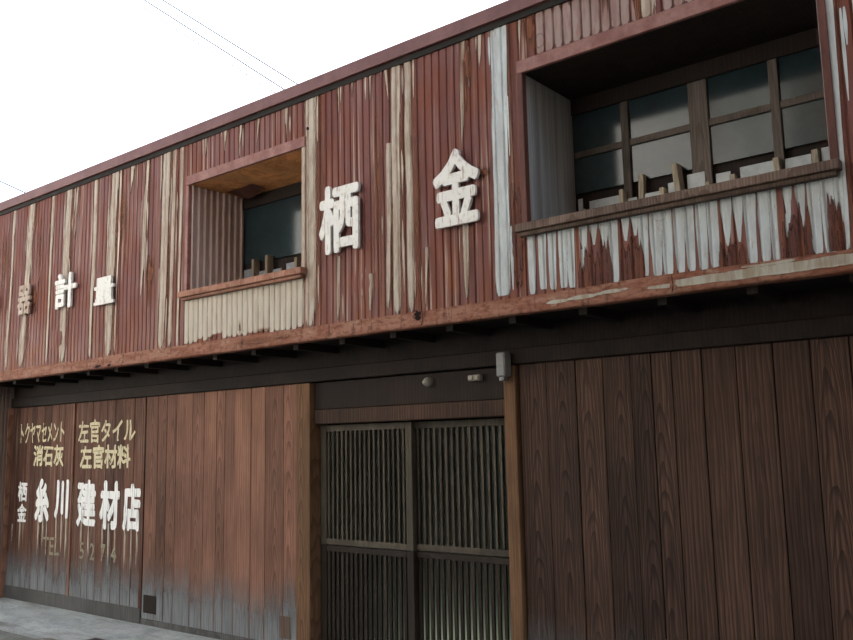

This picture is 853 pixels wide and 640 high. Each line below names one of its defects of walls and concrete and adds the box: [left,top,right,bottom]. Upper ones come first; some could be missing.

rust [633,0,642,20]
rust [524,15,536,58]
peeling [527,0,853,304]
rust [511,187,523,287]
rust [146,259,154,300]